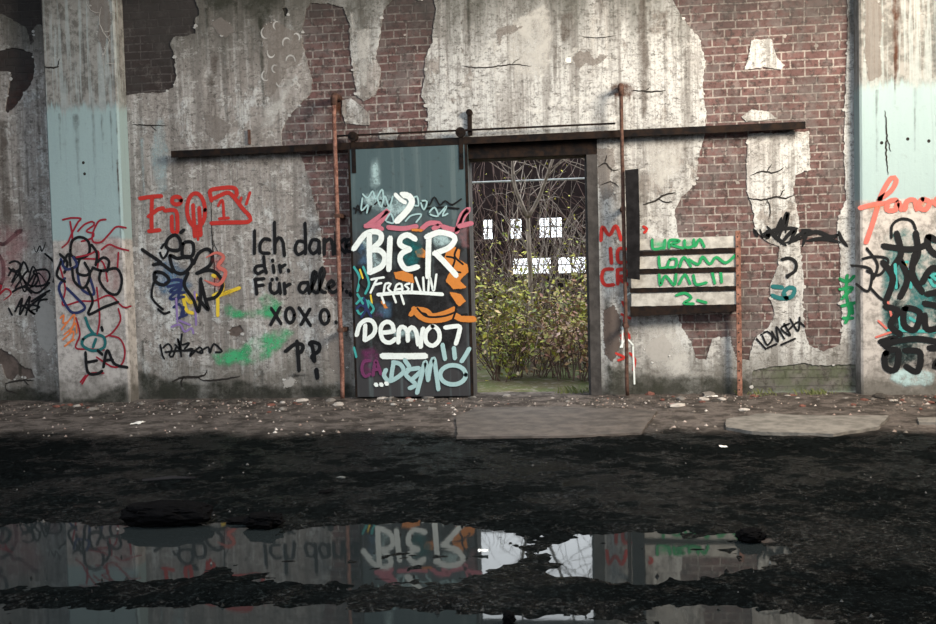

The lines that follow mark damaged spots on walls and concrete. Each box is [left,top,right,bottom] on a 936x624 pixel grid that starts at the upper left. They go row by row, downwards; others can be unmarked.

spalling [0,0,42,113]
peeling [89,0,112,55]
spalling [122,0,199,95]
spalling [281,0,436,301]
spalling [673,0,848,360]
spalling [0,348,35,380]
spalling [749,363,856,393]